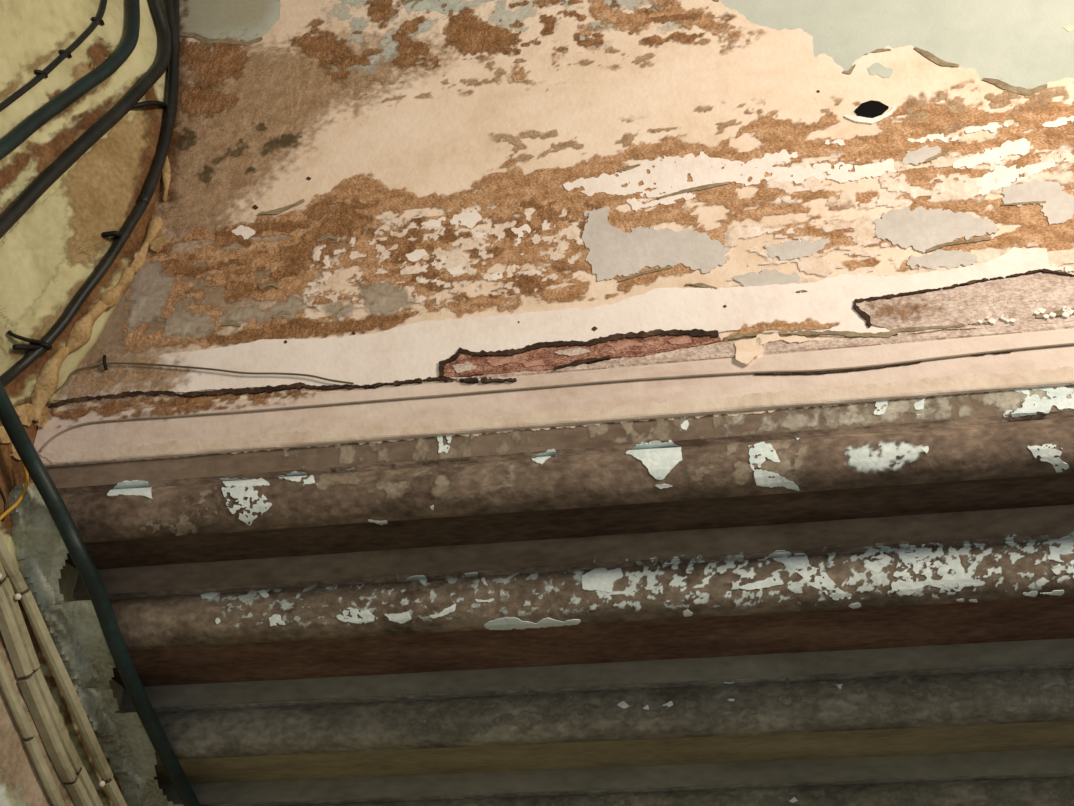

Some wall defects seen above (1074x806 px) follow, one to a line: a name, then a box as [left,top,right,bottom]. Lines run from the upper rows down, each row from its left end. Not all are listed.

peeling [0,0,1074,407]
crack [48,376,517,427]
peeling [23,366,1074,536]
crack [722,322,990,366]
spalling [0,443,184,806]
peeling [201,532,1074,630]